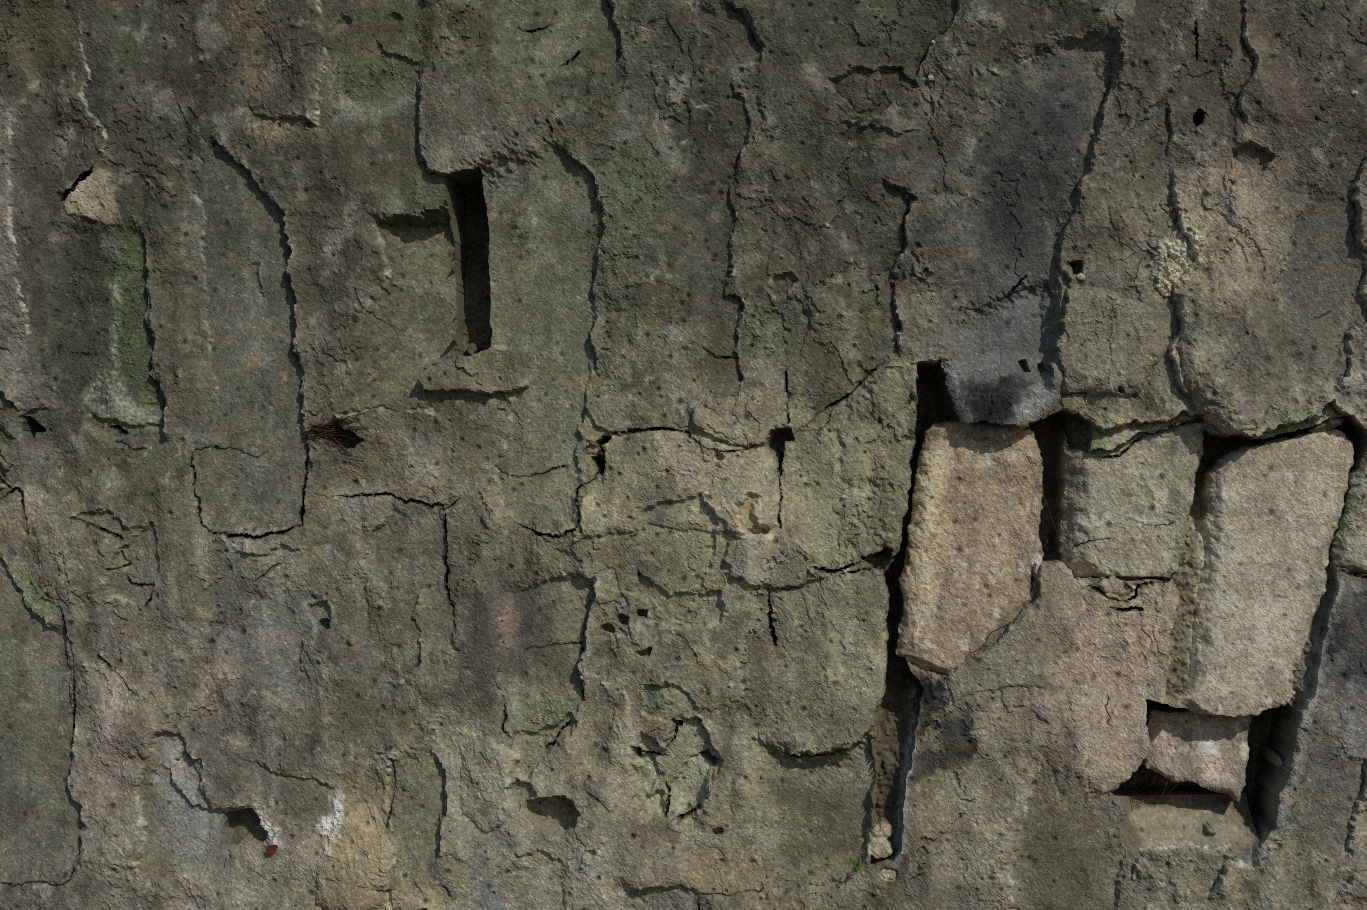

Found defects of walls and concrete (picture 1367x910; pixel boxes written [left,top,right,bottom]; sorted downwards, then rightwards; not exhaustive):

leakage [963,257,1059,311]
crack [0,437,29,535]
crack [190,432,460,643]
crack [497,361,890,538]
crack [756,547,889,645]
peeling [127,724,252,876]